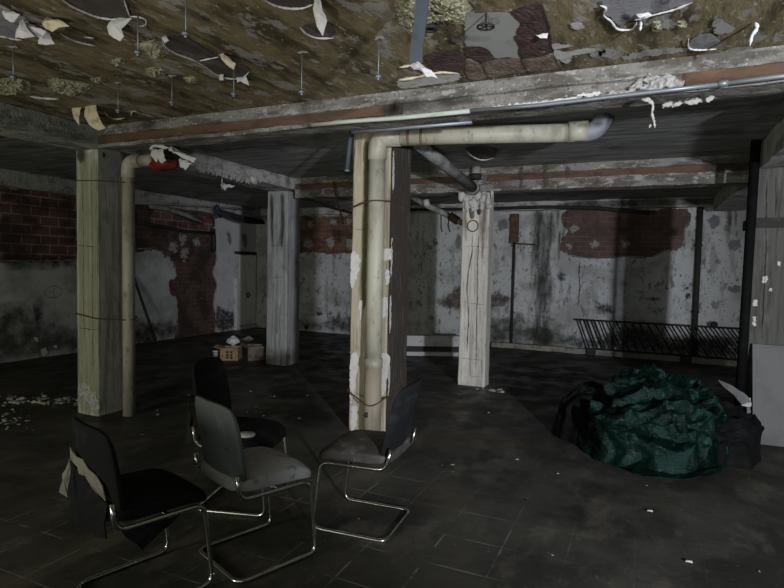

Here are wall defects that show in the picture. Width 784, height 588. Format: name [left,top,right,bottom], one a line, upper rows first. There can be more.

peeling [0,4,95,49]
peeling [464,12,520,59]
peeling [600,0,692,31]
peeling [536,18,759,64]
damp [641,97,656,128]
flaking render [0,187,77,264]
flaking render [135,204,256,338]
flaking render [300,214,361,288]
damp [490,212,577,346]
flaking render [560,208,691,259]
damp [0,308,78,358]
peeling [349,352,359,431]